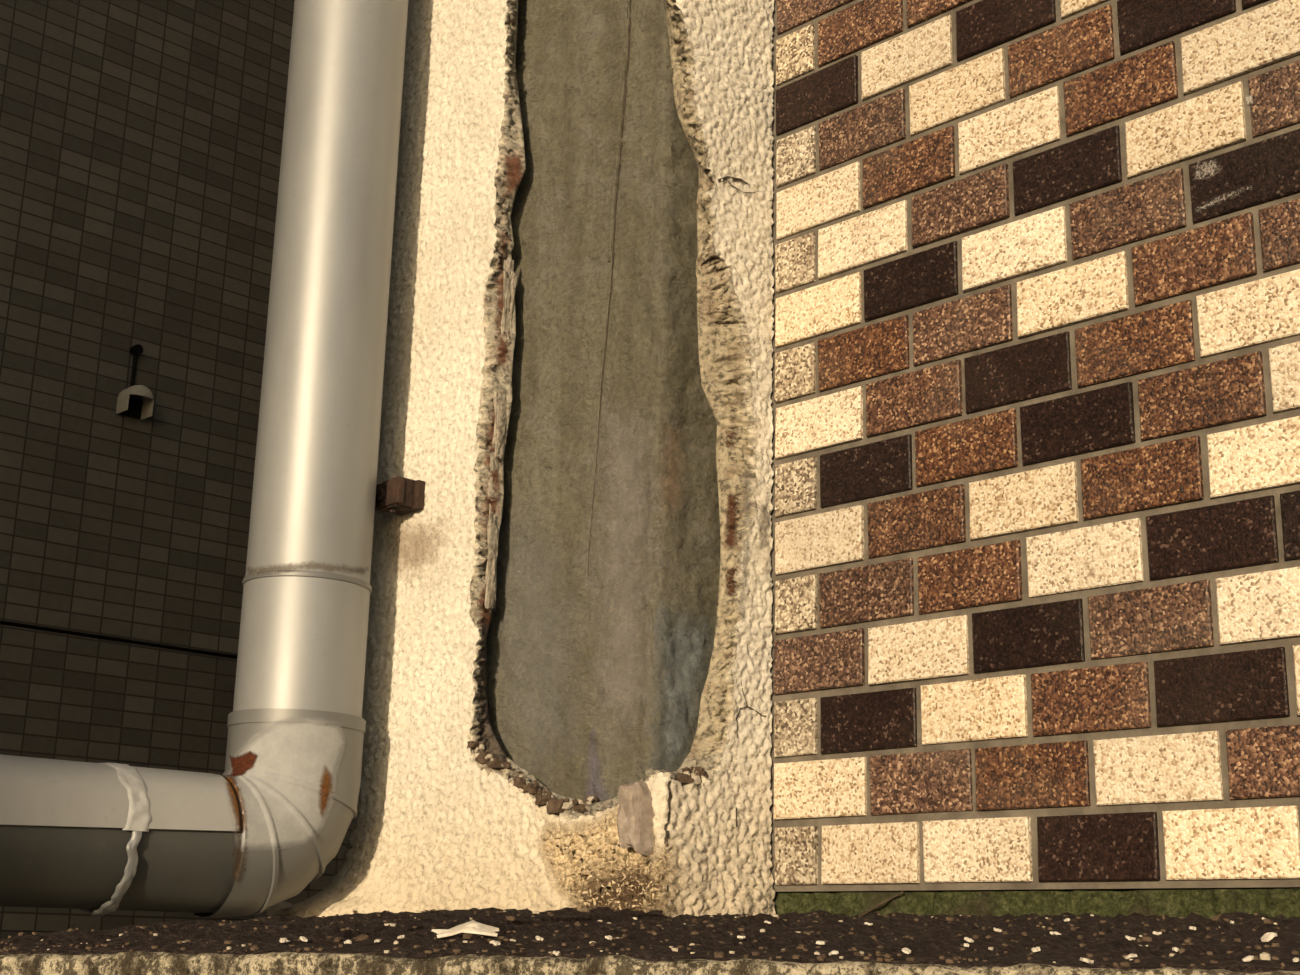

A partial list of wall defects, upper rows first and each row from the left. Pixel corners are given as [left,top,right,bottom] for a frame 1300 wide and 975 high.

corrosion [505,150,525,196]
corrosion [497,277,508,366]
crack [587,0,631,587]
spalling [467,0,768,913]
crack [664,781,672,907]